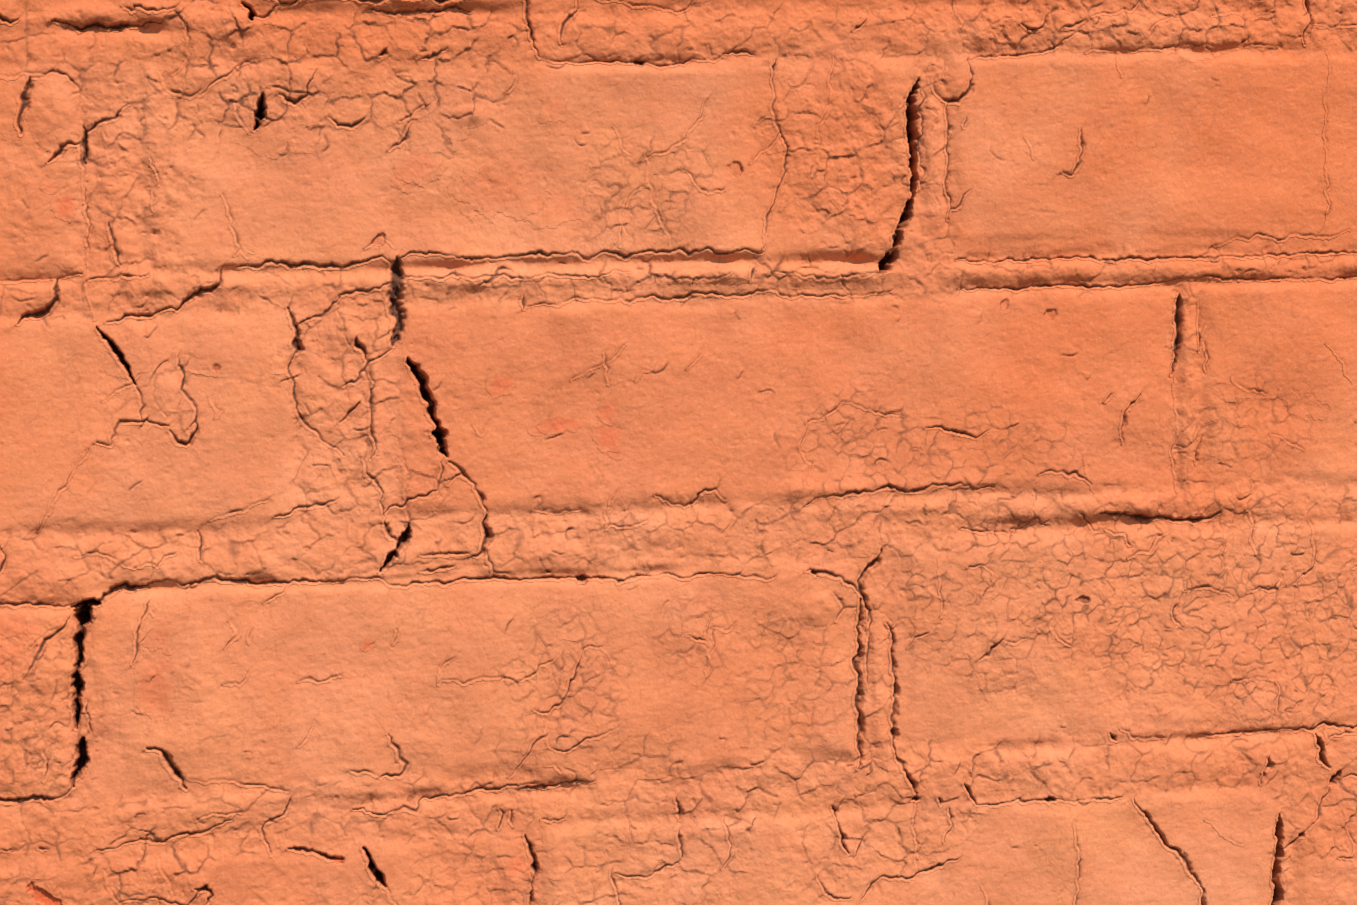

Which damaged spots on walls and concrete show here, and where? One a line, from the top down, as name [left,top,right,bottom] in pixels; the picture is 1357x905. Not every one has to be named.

crack [955,0,1357,493]
crack [0,0,1142,806]
crack [1037,453,1223,560]
crack [1170,506,1319,630]
crack [0,844,48,853]
crack [93,642,619,905]
crack [608,796,686,905]
crack [719,817,734,871]
crack [804,520,1208,905]
crack [1108,672,1357,905]